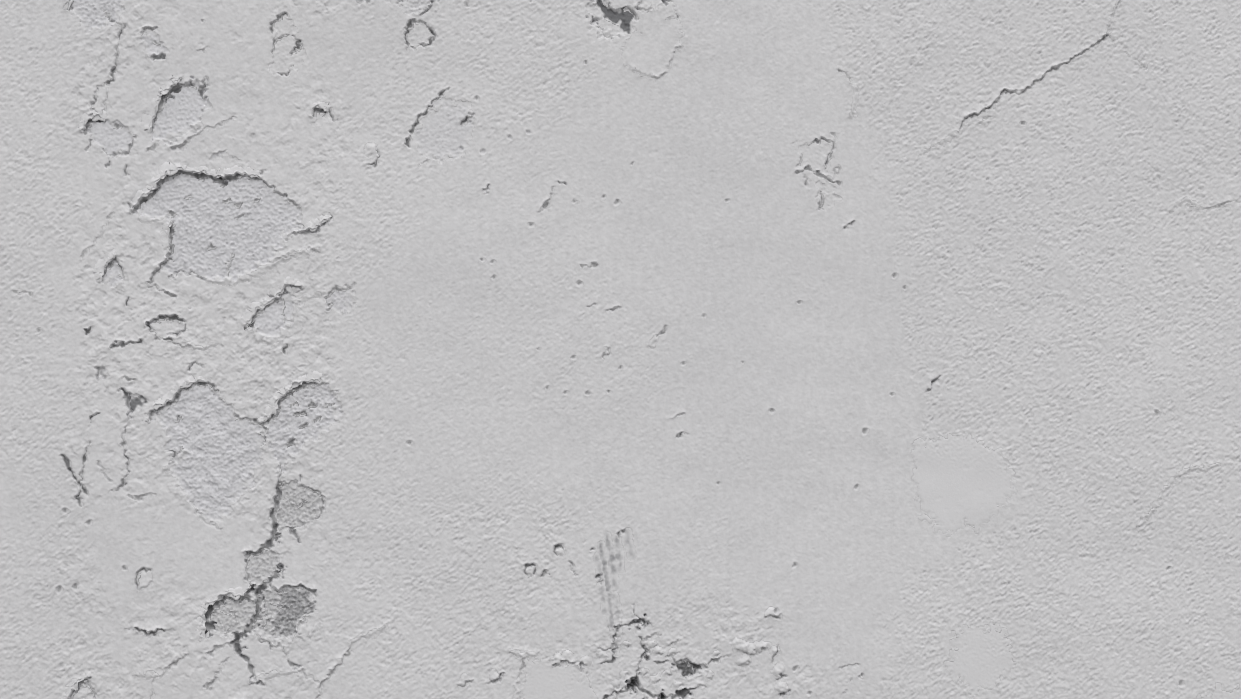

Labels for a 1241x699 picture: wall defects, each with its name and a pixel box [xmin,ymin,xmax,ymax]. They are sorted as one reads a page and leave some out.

spalling [61,0,126,33]
peeling [141,26,170,65]
spalling [585,0,685,82]
crack [923,0,1150,154]
spalling [78,75,357,356]
spalling [60,361,344,691]
peeling [61,672,97,699]
crack [596,601,730,699]